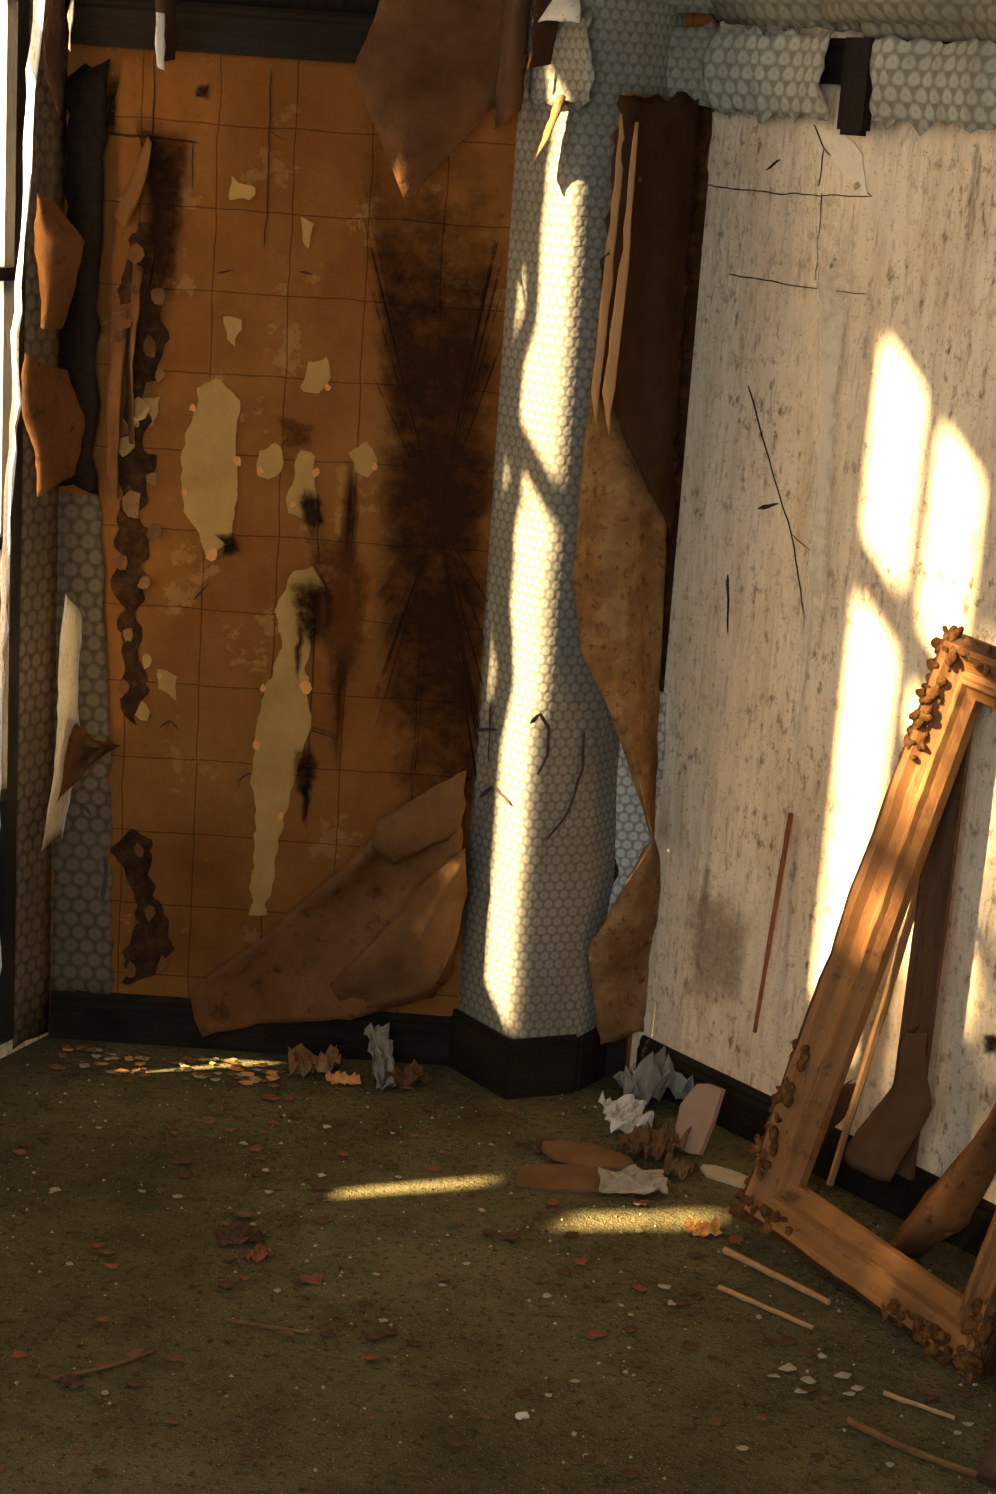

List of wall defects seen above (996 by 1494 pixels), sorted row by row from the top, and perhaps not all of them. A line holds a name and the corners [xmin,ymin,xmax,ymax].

peeling [181,378,320,561]
peeling [300,357,331,394]
damp [340,475,356,566]
peeling [349,442,378,477]
damp [378,213,493,800]
flaking render [659,106,712,692]
peeling [248,565,326,916]